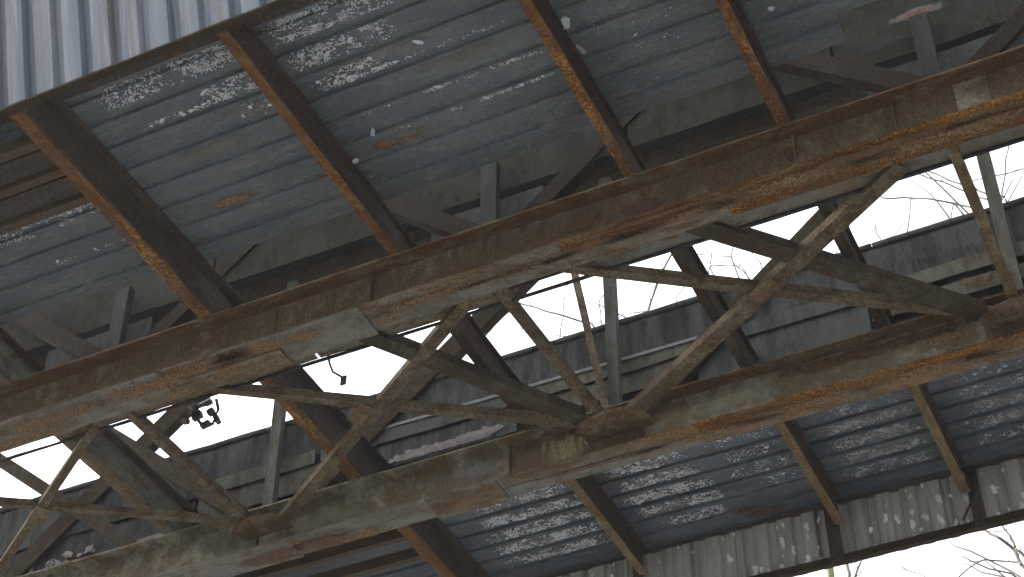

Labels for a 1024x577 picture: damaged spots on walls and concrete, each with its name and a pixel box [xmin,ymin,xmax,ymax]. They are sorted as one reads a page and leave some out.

corrosion [372,98,1024,327]
corrosion [546,337,1024,479]